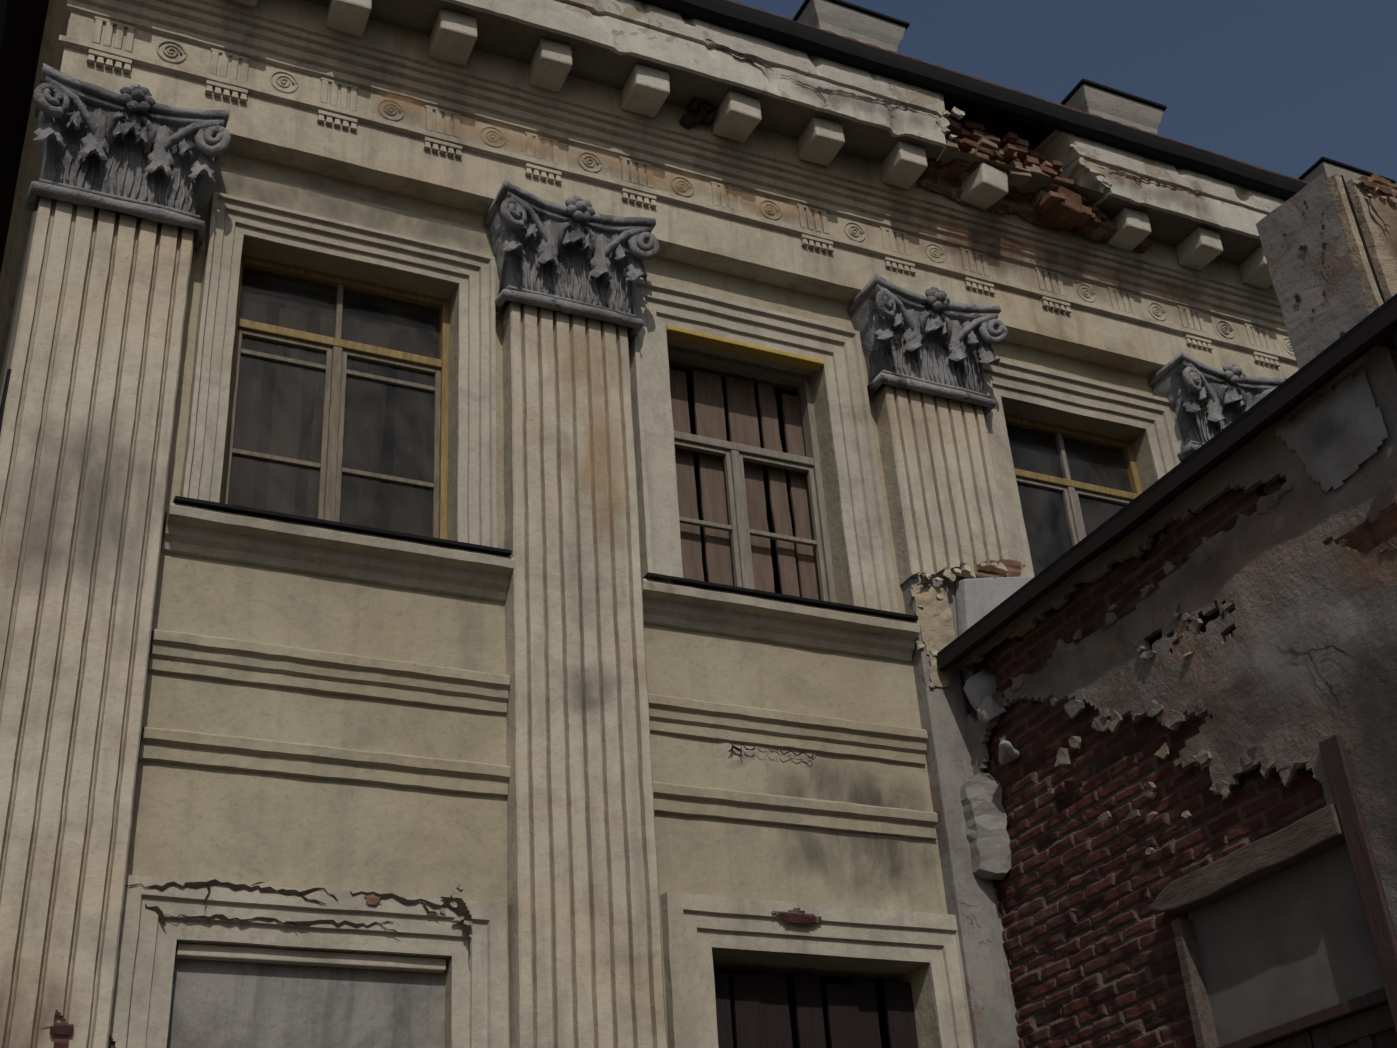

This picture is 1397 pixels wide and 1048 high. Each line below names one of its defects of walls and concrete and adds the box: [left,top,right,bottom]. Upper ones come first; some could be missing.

spalling [918,107,1118,244]
flaking render [1358,173,1397,206]
flaking render [910,479,1329,1048]
crack [125,879,473,956]
spalling [41,1010,74,1048]